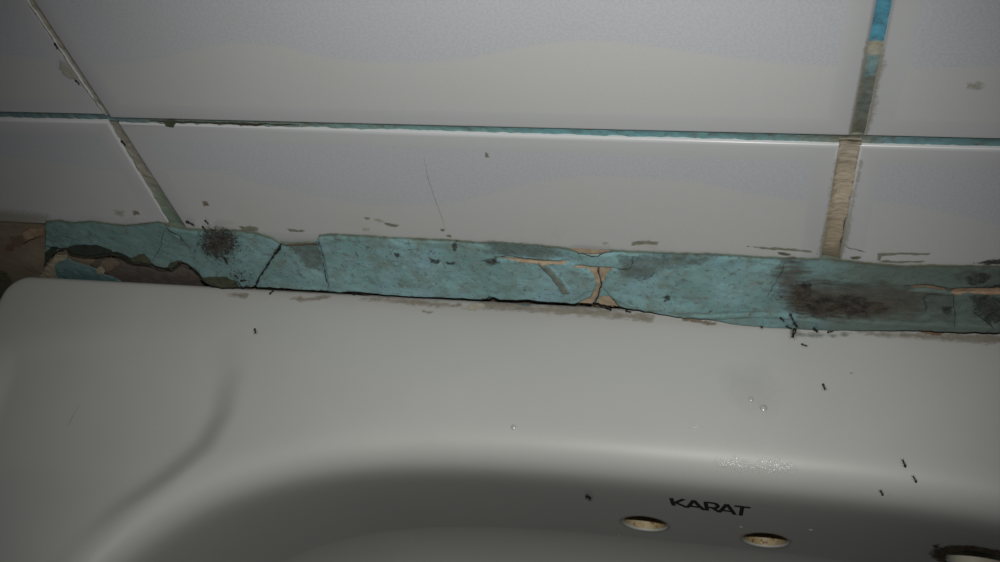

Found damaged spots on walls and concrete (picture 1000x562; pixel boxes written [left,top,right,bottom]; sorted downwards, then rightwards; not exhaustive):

spalling [39,245,252,289]
water stain [199,227,254,297]
crack [255,242,654,310]
peeling [482,248,619,307]